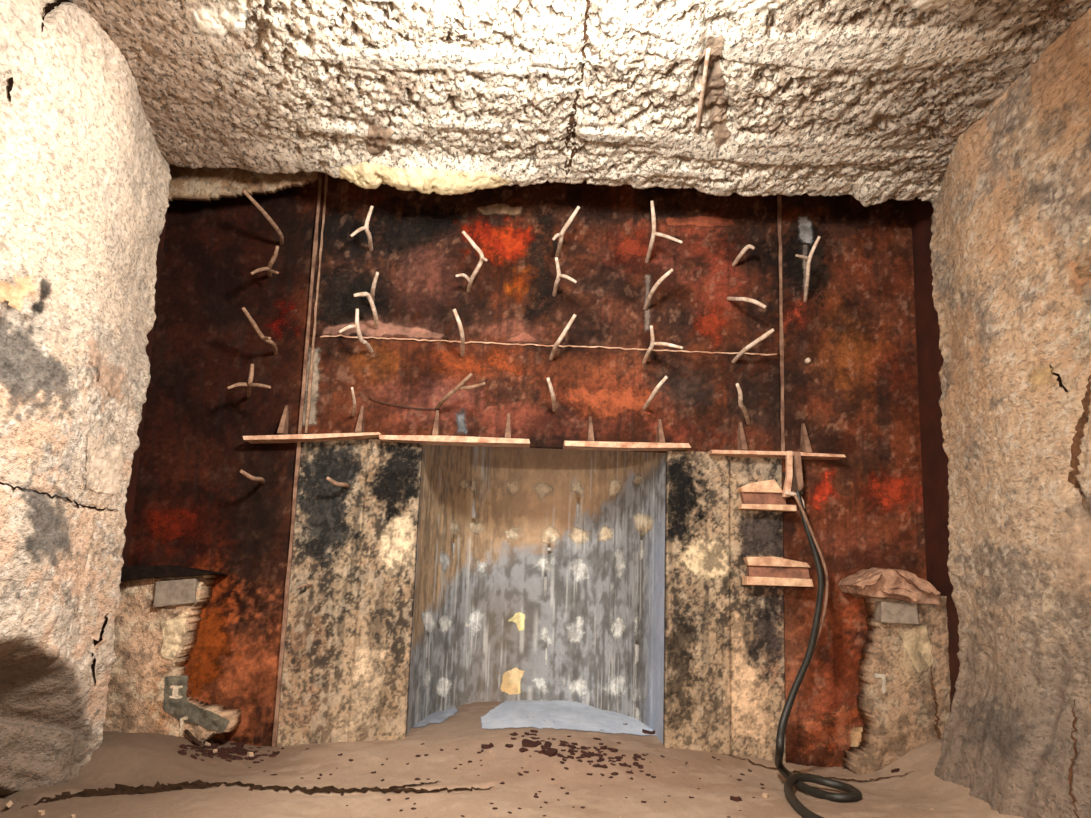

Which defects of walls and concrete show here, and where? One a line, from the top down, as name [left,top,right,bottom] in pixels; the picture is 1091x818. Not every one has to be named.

crack [42,0,73,32]
crack [563,0,591,183]
rust [461,217,533,300]
rust [558,377,652,420]
crack [1049,364,1091,511]
mould [296,440,368,571]
mould [370,442,421,520]
leakage [668,451,708,548]
leakage [737,514,783,558]
rust [810,470,837,511]
rust [797,703,860,755]
crack [21,780,494,808]